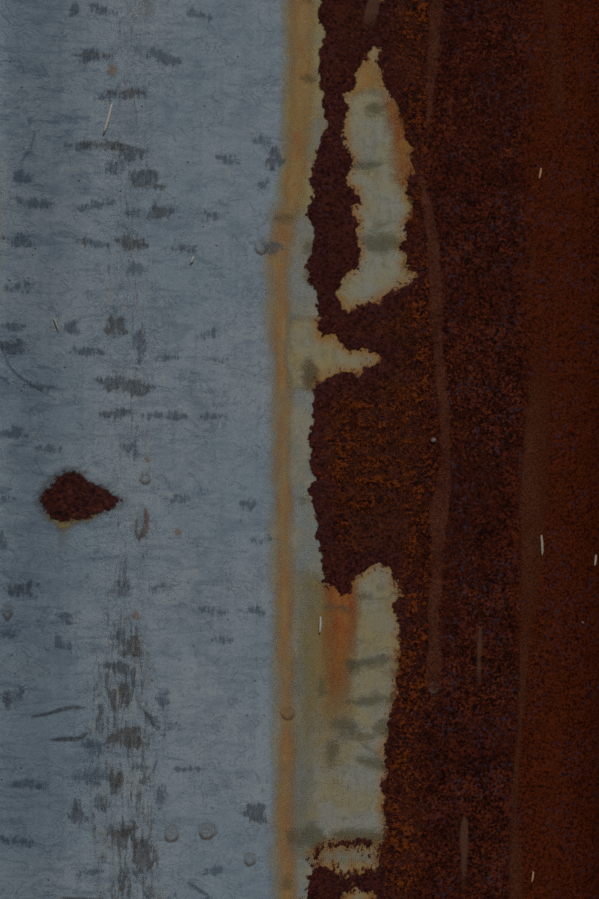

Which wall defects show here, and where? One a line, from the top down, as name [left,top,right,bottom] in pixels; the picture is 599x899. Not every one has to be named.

corrosion [38,470,122,529]
corrosion [264,0,599,899]